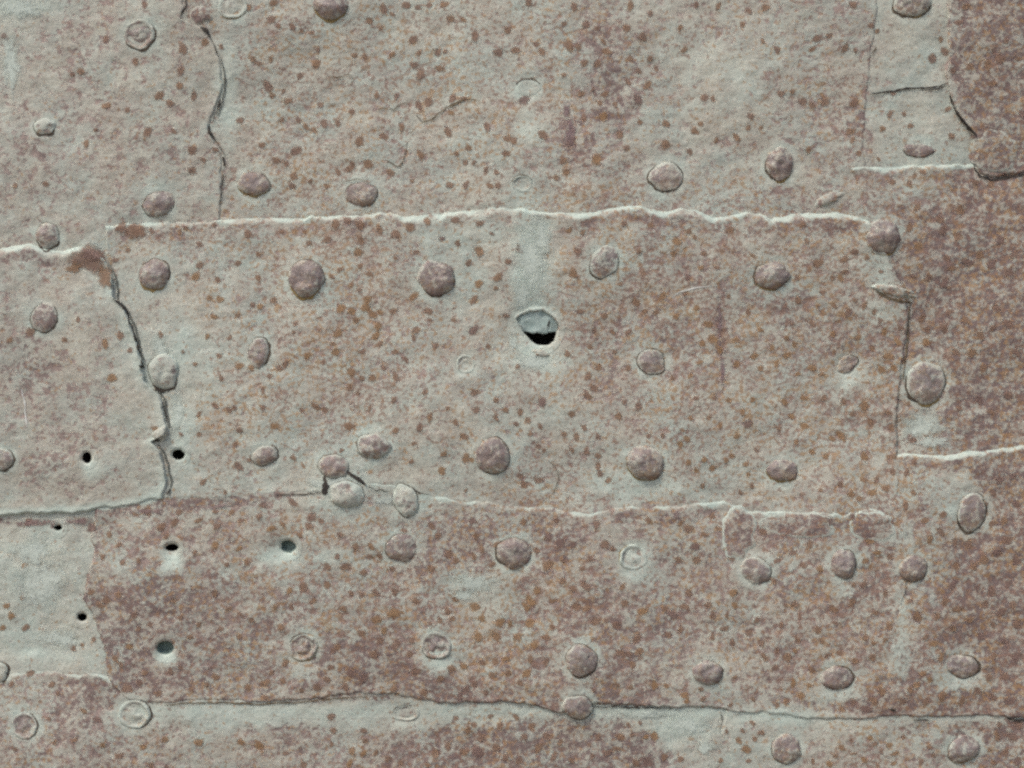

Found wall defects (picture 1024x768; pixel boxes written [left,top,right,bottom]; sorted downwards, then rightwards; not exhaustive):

corrosion [366,2,478,41]
crack [181,0,226,205]
corrosion [263,80,355,133]
corrosion [258,142,395,189]
corrosion [67,222,154,287]
corrosion [302,217,432,396]
corrosion [814,248,907,374]
crack [110,265,172,495]
corrosion [427,586,555,700]
corrosion [935,501,1022,705]
crack [170,697,365,705]
crack [595,703,672,711]